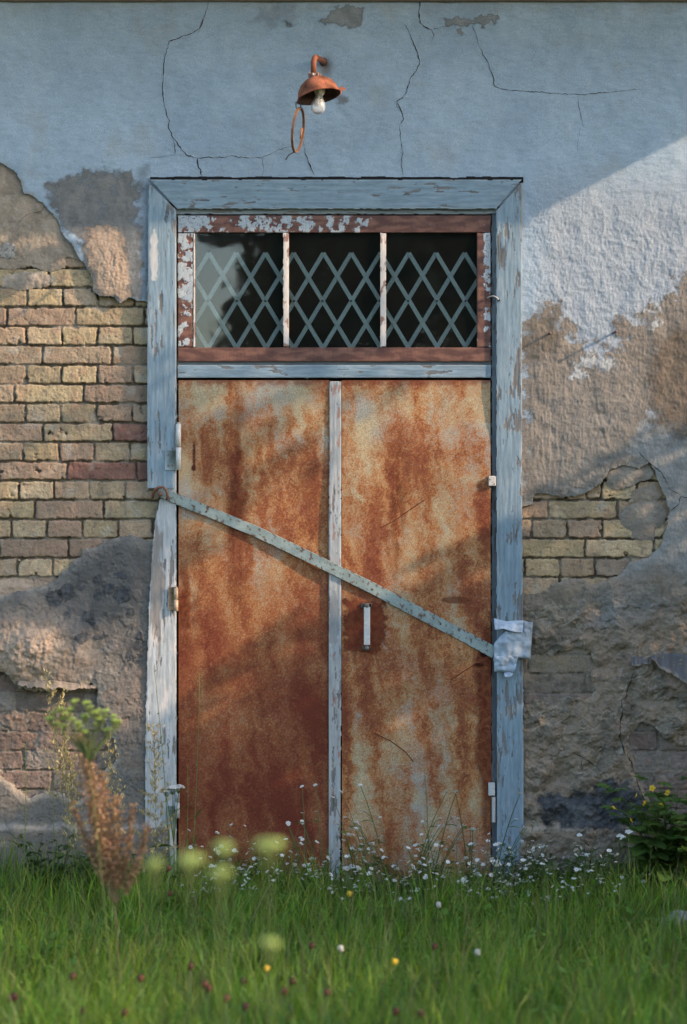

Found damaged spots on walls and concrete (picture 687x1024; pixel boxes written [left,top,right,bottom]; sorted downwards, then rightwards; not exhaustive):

crack [151,2,316,176]
peeling [319,4,363,29]
peeling [444,14,499,35]
crack [396,2,642,173]
flaking render [0,163,161,595]
peeling [522,271,687,594]
corrosion [232,484,243,530]
corrosion [179,579,190,628]
corrosion [342,598,388,654]
flaking render [0,671,117,801]
corrosion [475,653,491,821]
crack [619,673,645,801]